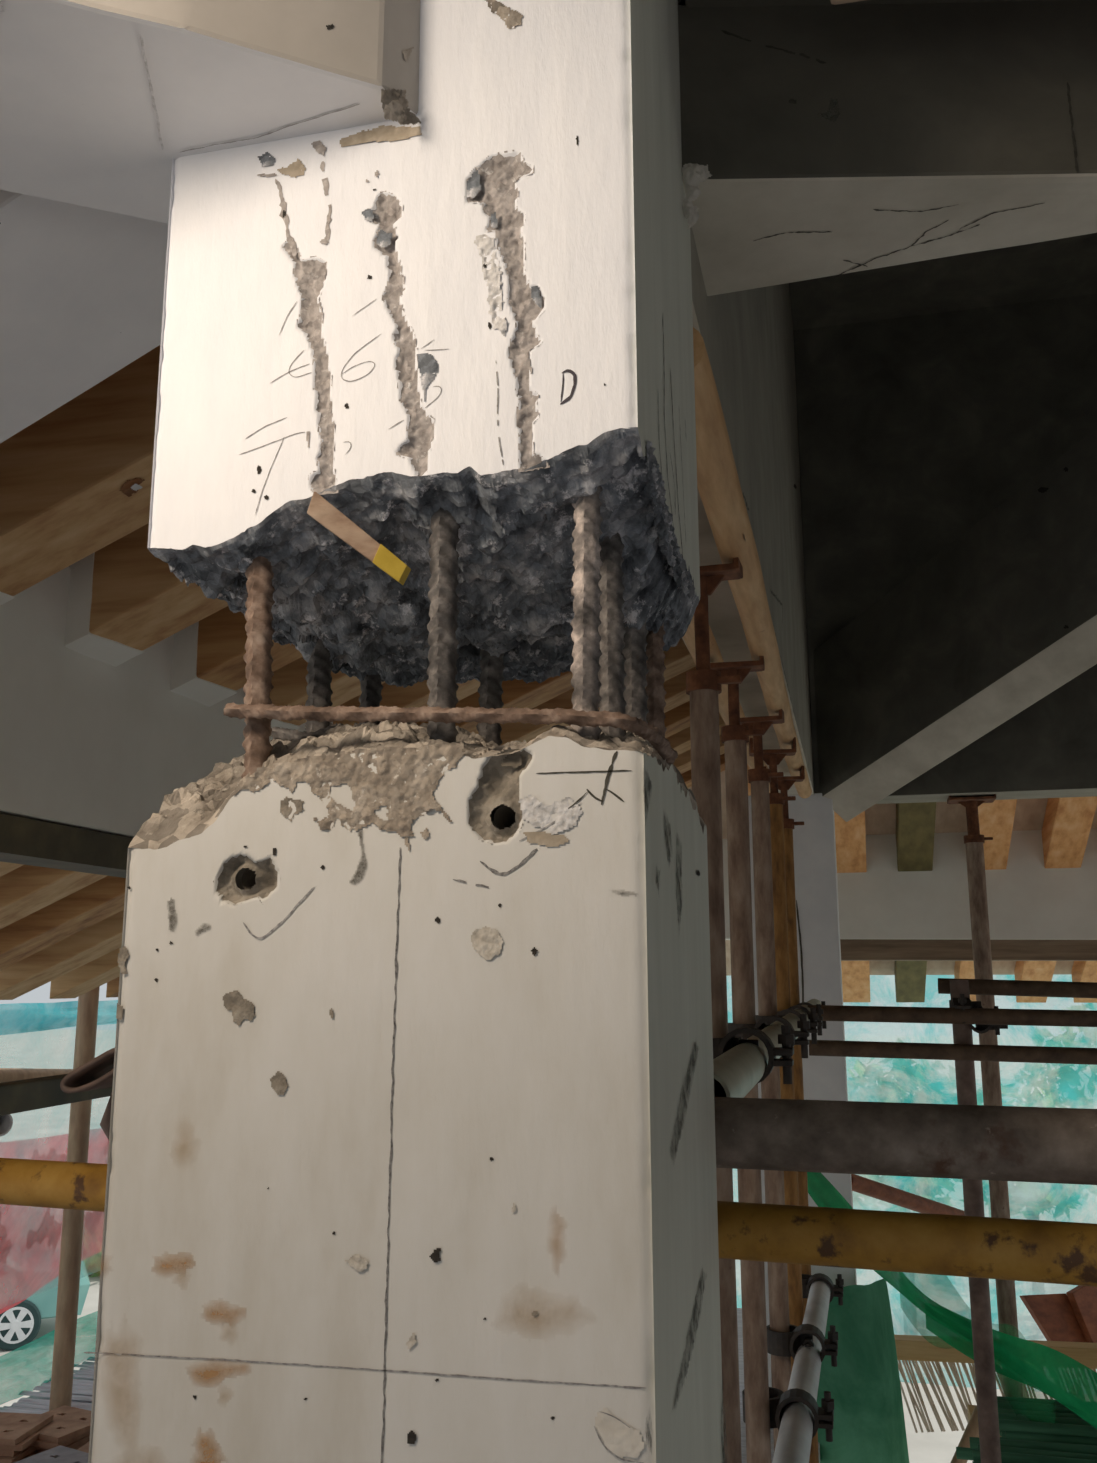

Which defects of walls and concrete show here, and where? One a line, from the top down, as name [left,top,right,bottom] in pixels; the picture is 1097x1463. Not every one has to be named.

spalling [257,88,422,178]
crack [754,203,1043,277]
crack [495,372,503,464]
spalling [149,427,700,688]
spalling [128,720,706,921]